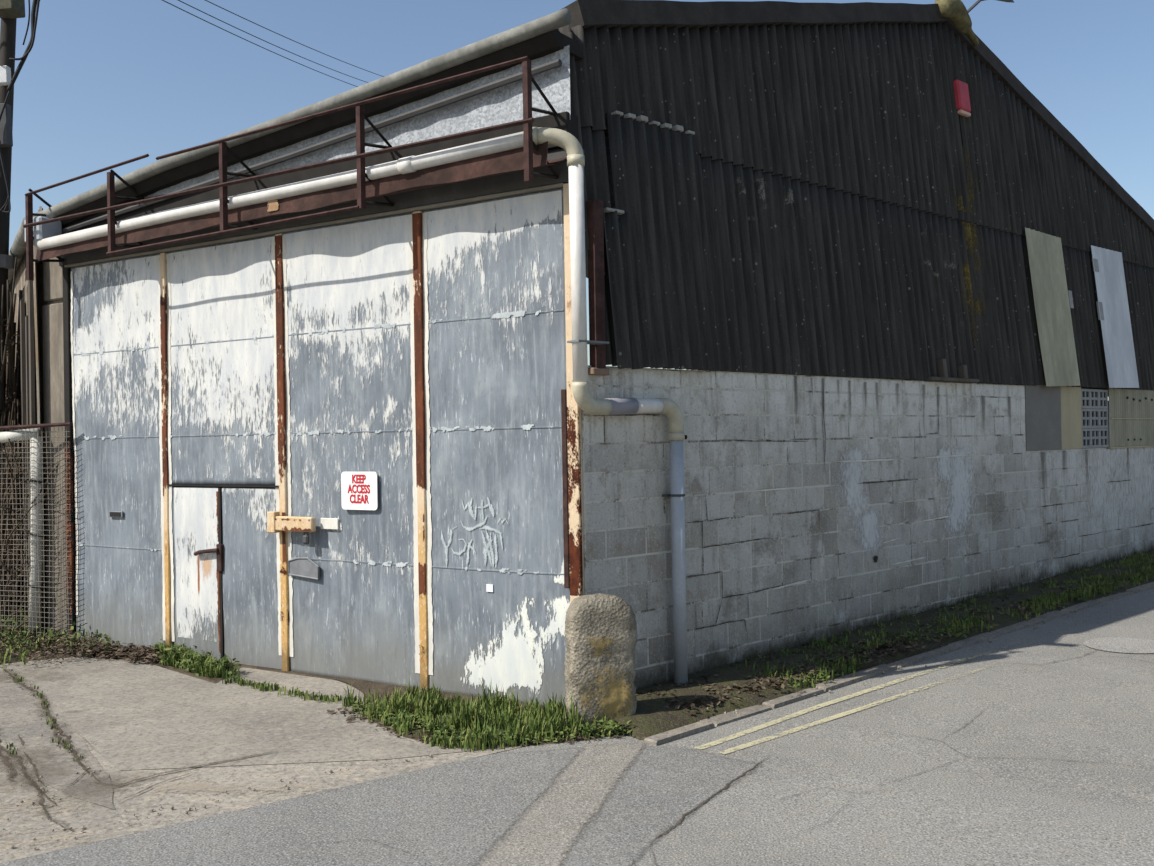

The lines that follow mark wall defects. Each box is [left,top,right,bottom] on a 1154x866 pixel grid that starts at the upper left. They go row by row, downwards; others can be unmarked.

corrosion [160,276,169,496]
corrosion [275,235,287,482]
corrosion [275,512,311,575]
peeling [73,190,562,642]
corrosion [412,213,426,489]
corrosion [418,562,426,598]
peeling [461,560,570,700]
corrosion [567,406,583,596]
water stain [839,448,883,550]
water stain [937,447,976,535]
crack [0,667,345,830]